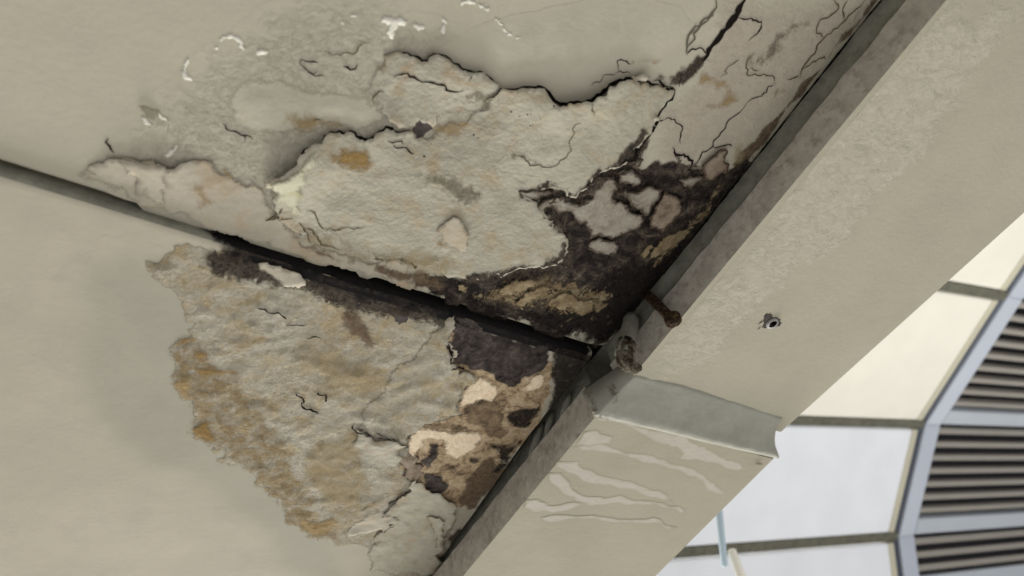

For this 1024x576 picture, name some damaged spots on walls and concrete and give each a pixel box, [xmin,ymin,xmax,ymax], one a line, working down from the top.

peeling [68,0,730,316]
damp [203,0,882,413]
crack [372,0,865,172]
damp [51,231,445,576]
damp [436,519,462,559]
spalling [347,315,553,576]